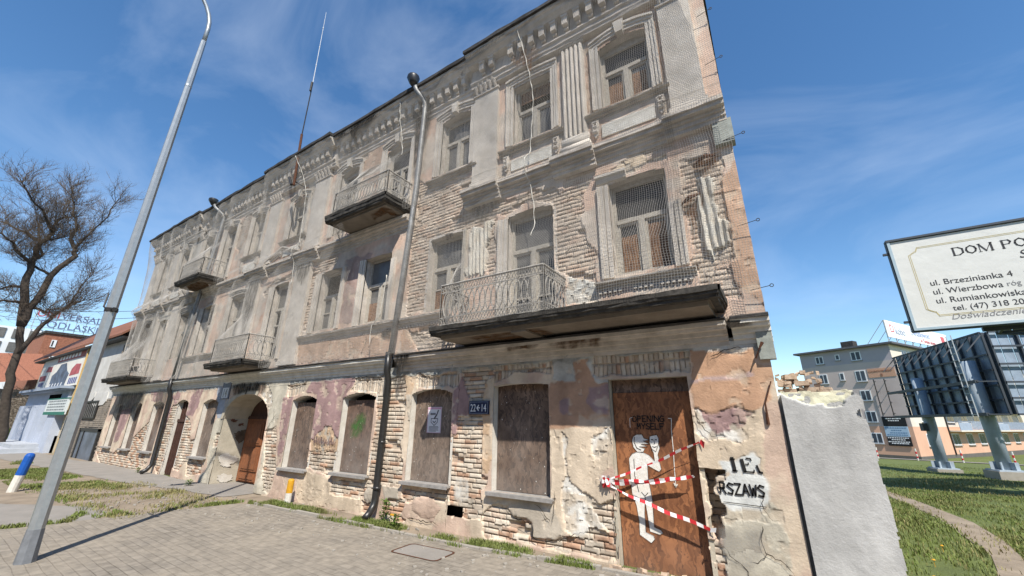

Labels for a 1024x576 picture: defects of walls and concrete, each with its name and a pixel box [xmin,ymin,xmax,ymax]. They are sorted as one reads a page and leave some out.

spalling [407,169,598,316]
spalling [612,142,744,299]
spalling [97,405,203,476]
spalling [309,361,617,560]
peeling [694,405,754,443]
peeling [704,452,770,576]